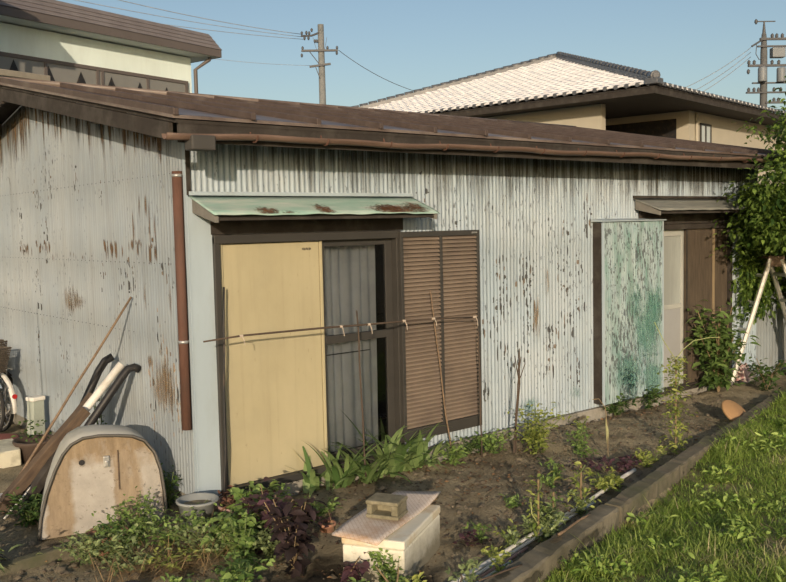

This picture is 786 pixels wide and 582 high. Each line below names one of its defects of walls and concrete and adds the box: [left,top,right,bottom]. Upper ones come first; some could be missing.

damp [466,156,612,184]
damp [624,163,755,190]
corrosion [372,203,427,212]
corrosion [103,216,141,258]
corrosion [138,196,157,262]
peeling [618,272,662,398]